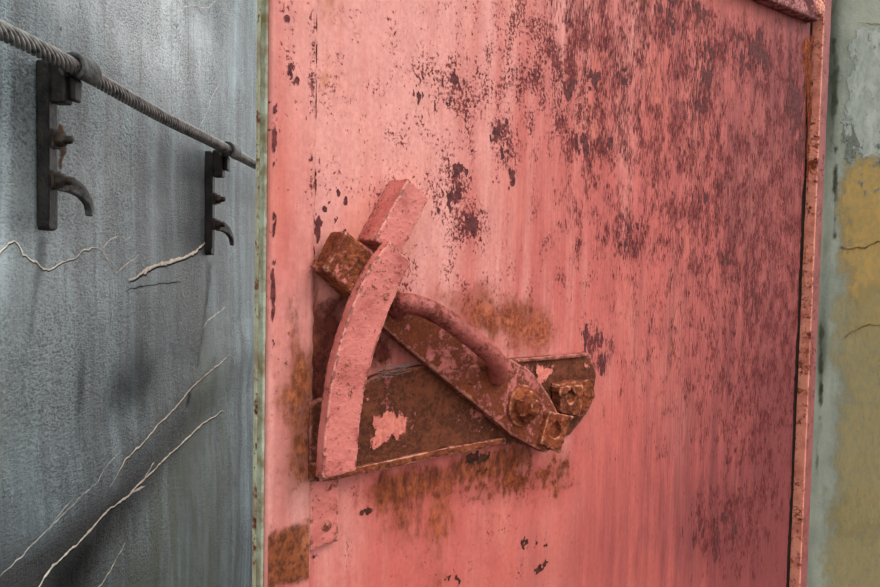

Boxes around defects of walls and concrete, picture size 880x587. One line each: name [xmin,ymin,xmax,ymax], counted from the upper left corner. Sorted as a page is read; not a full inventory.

rust [801,36,814,190]
crack [0,236,205,292]
rust [277,295,345,481]
rust [373,337,391,364]
rust [452,290,551,352]
peeling [826,25,880,587]
crack [840,241,880,250]
crack [1,356,228,587]
rust [422,456,572,551]
rust [268,521,310,587]